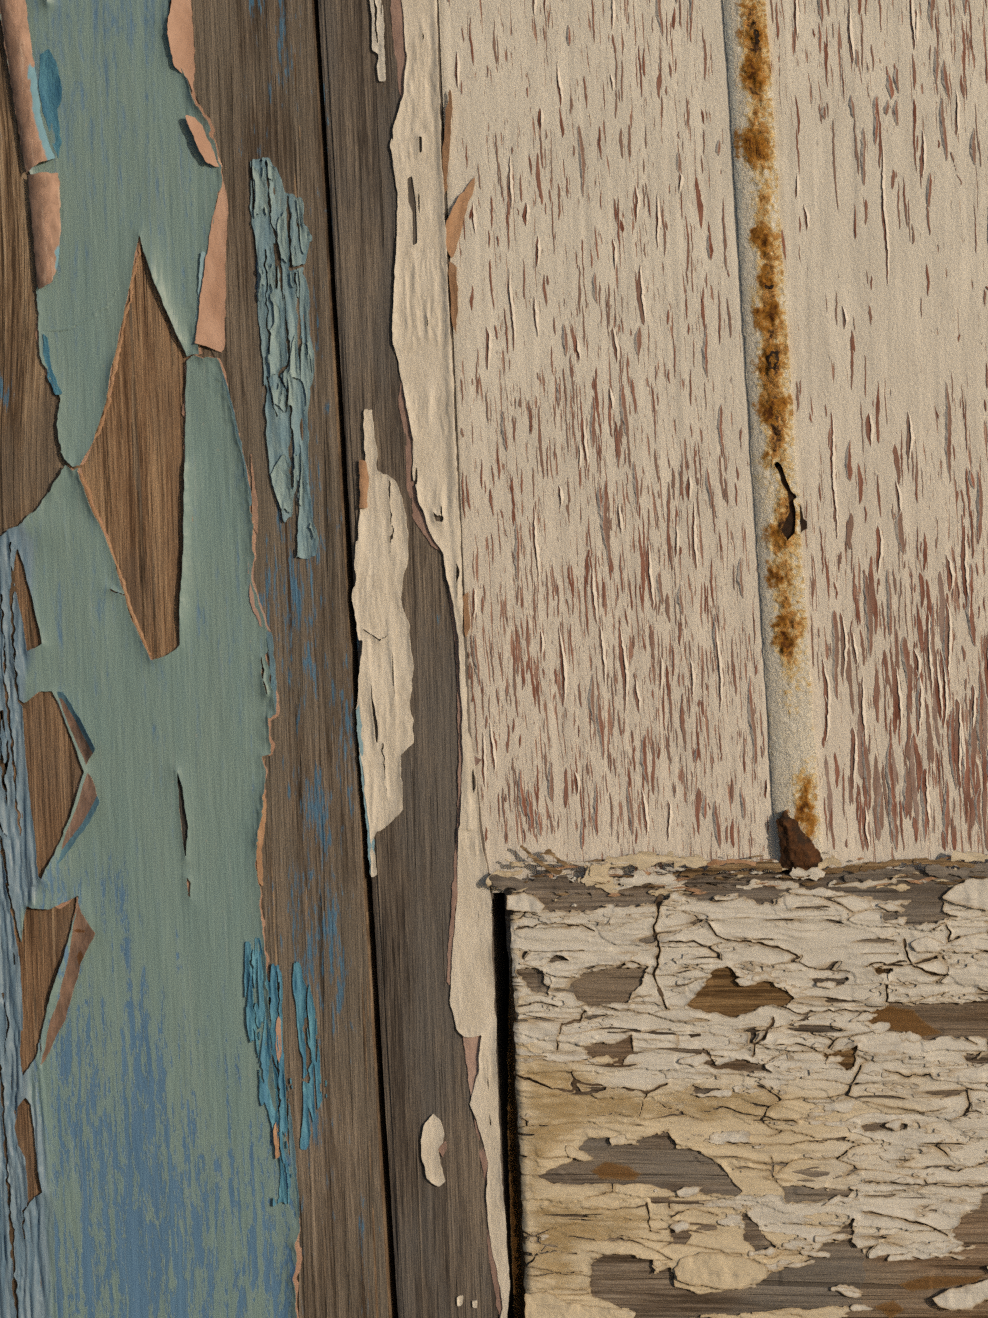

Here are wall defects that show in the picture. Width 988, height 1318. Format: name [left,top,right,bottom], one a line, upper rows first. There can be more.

rust [735,4,769,91]
rust [733,128,769,166]
rust [750,225,788,437]
rust [764,560,793,653]
peeling [0,0,503,1318]
crack [652,894,667,1009]
peeling [687,967,793,1017]
crack [709,924,800,958]
crack [885,939,948,1002]
crack [514,1071,668,1116]
peeling [538,1131,742,1198]
peeling [524,1185,988,1318]